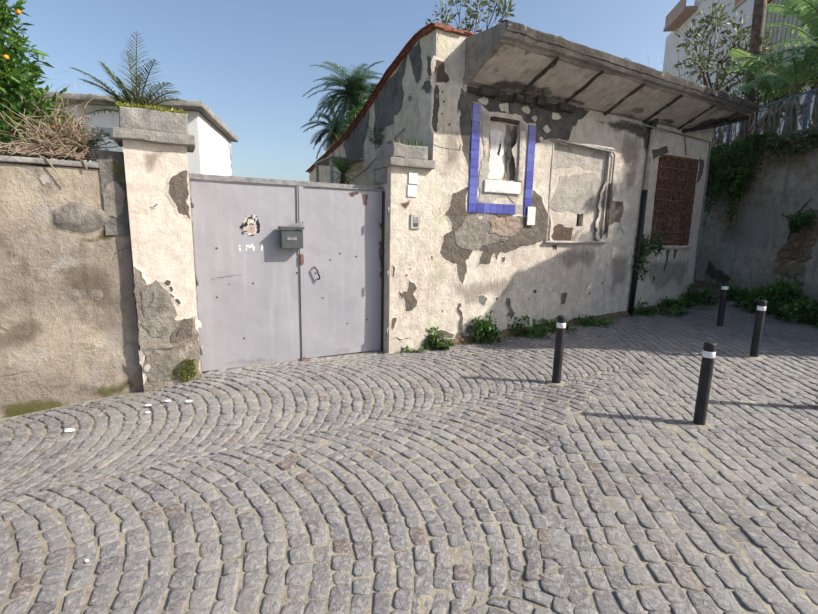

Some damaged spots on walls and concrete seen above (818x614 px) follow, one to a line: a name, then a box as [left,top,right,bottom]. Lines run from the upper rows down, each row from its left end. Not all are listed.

peeling [150,167,191,219]
peeling [332,39,592,287]
peeling [133,266,202,392]
peeling [388,263,418,332]